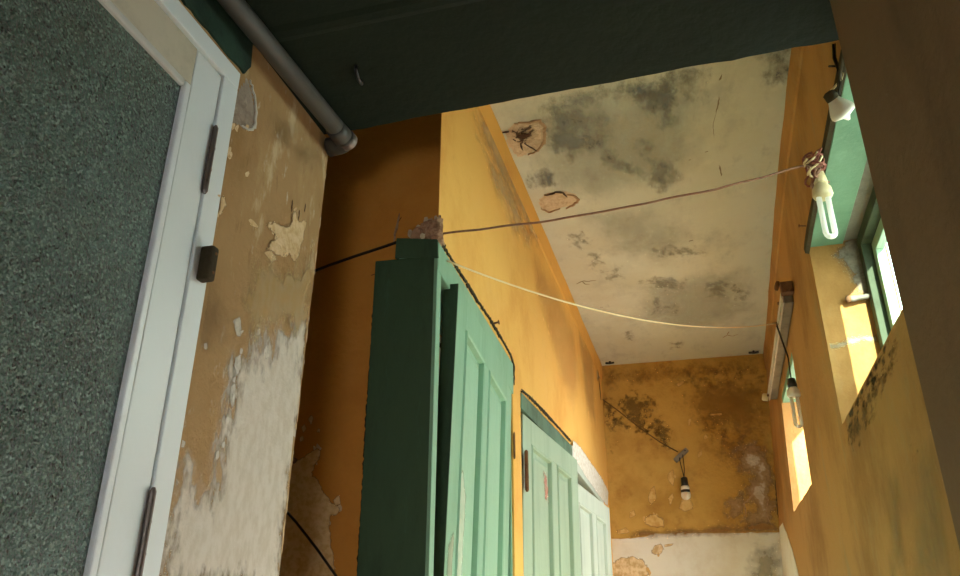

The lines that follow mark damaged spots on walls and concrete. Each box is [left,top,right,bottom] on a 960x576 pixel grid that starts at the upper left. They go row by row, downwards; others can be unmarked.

flaking render [232,78,258,132]
leakage [626,72,692,129]
flaking render [502,119,547,157]
leakage [551,97,633,173]
leakage [540,171,552,186]
peeling [249,208,307,262]
peeling [408,215,608,506]
leakage [830,336,894,446]
peeling [160,317,342,576]
leakage [604,396,670,447]
leakage [724,444,777,525]
peeling [613,556,651,576]